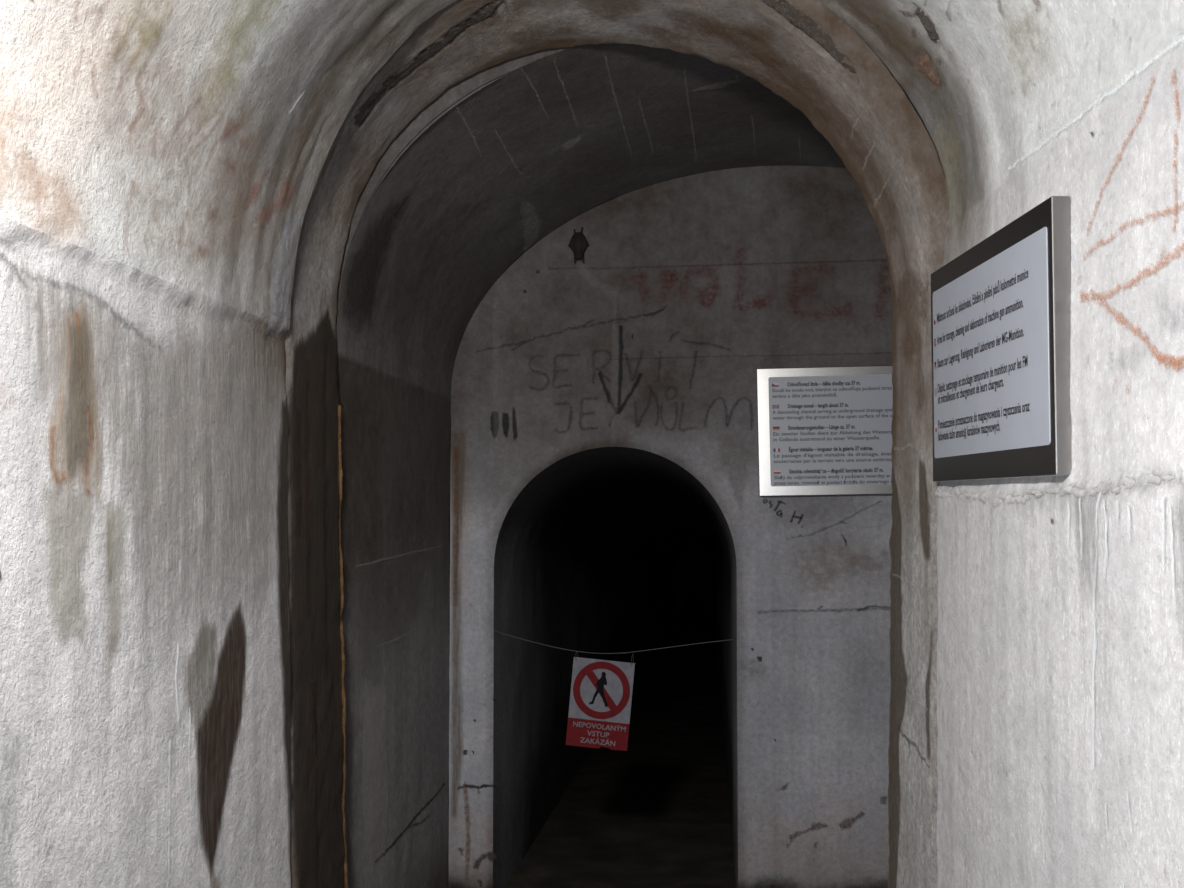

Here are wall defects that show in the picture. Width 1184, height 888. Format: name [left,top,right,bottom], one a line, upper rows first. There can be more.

spalling [354,0,512,126]